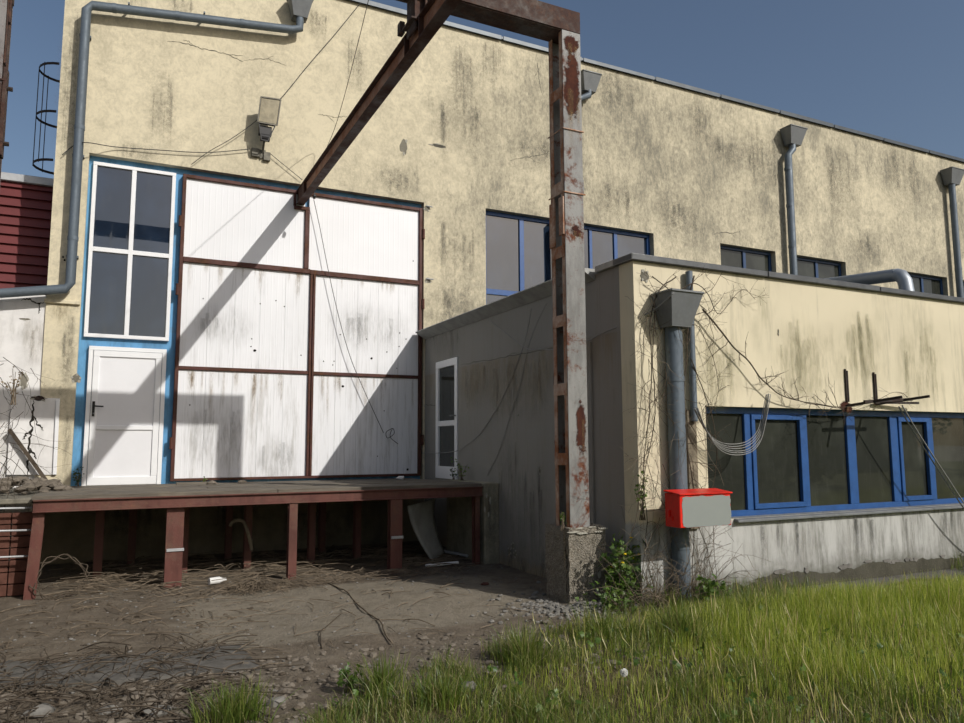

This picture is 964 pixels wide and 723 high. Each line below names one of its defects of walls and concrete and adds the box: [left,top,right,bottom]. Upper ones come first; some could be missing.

crack [171,40,284,65]
corrosion [563,35,581,118]
crack [22,400,43,475]